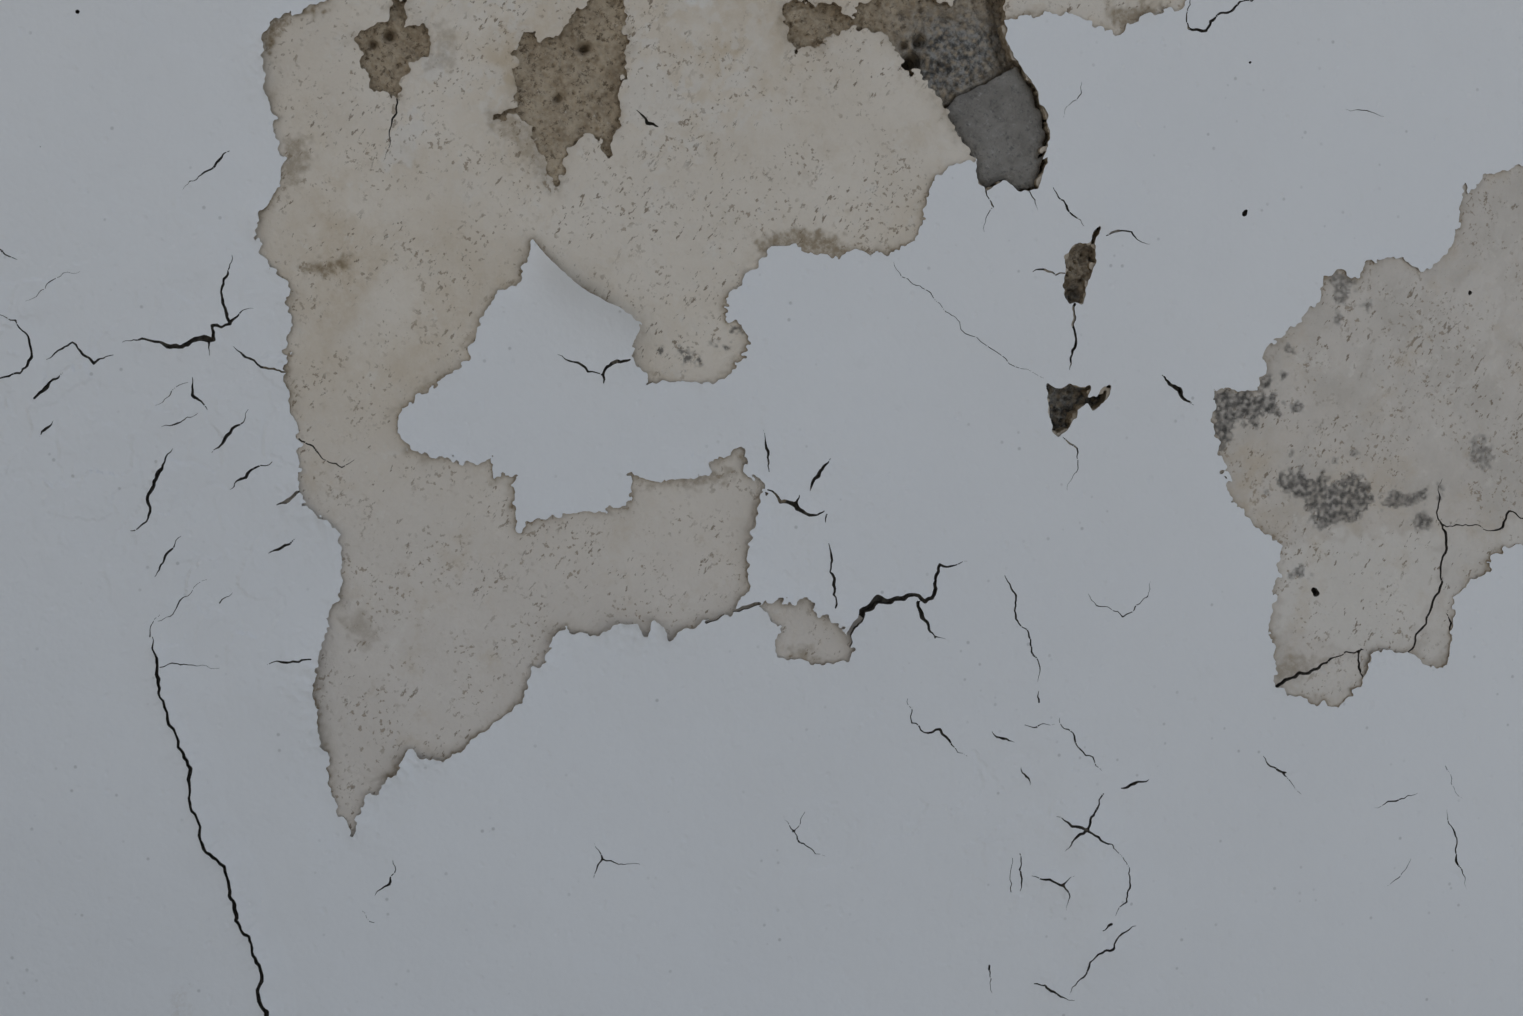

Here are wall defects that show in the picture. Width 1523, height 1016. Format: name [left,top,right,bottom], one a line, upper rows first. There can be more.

crack [0,257,282,1016]
crack [269,539,295,553]
crack [267,658,311,666]
crack [230,438,354,490]
peeling [254,0,1190,836]
crack [785,812,824,856]
crack [763,430,962,648]
crack [907,699,959,753]
crack [992,576,1150,1001]
crack [1275,648,1364,687]
peeling [1211,164,1523,707]
crack [1408,480,1523,652]